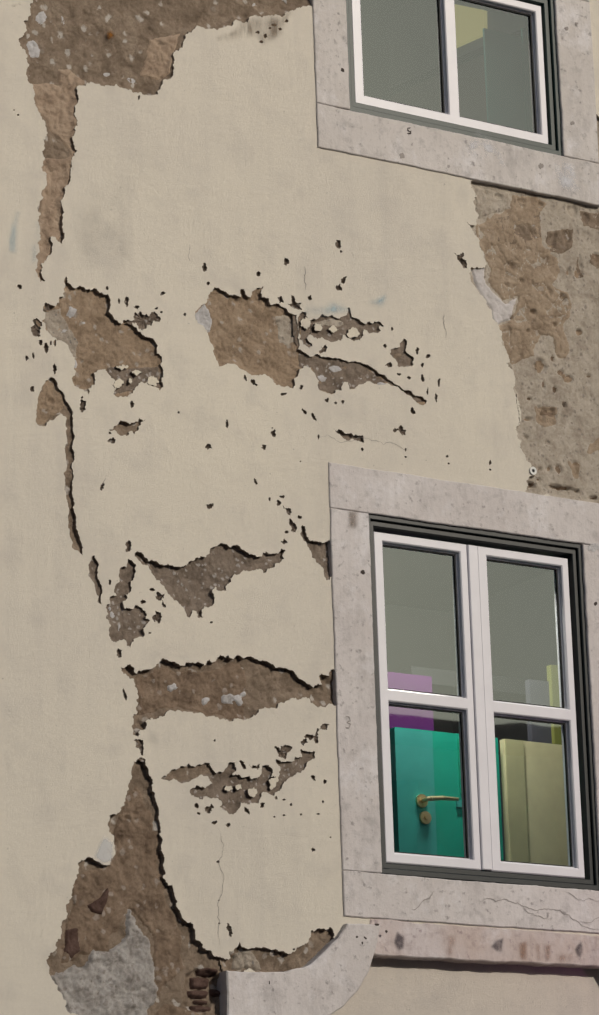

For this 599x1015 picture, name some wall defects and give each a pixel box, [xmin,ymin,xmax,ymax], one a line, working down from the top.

flaking render [19,0,311,282]
flaking render [25,278,162,552]
flaking render [183,263,440,414]
flaking render [457,181,599,503]
flaking render [46,496,335,1015]